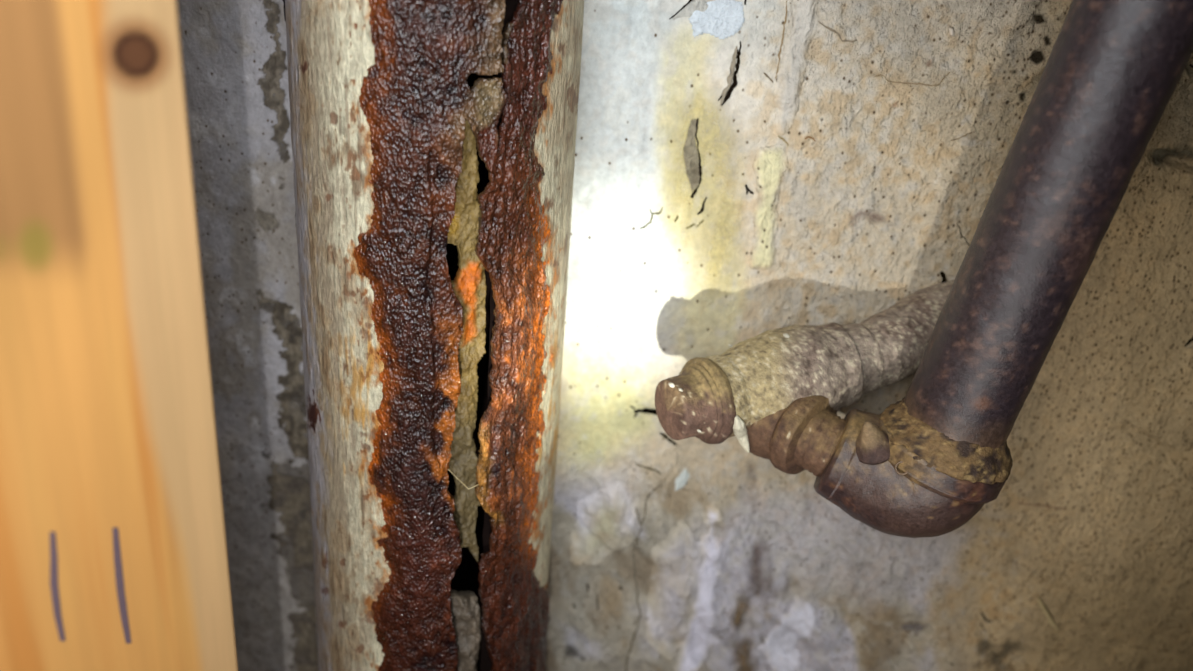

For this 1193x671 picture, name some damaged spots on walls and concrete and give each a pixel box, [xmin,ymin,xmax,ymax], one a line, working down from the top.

peeling [684,120,700,190]